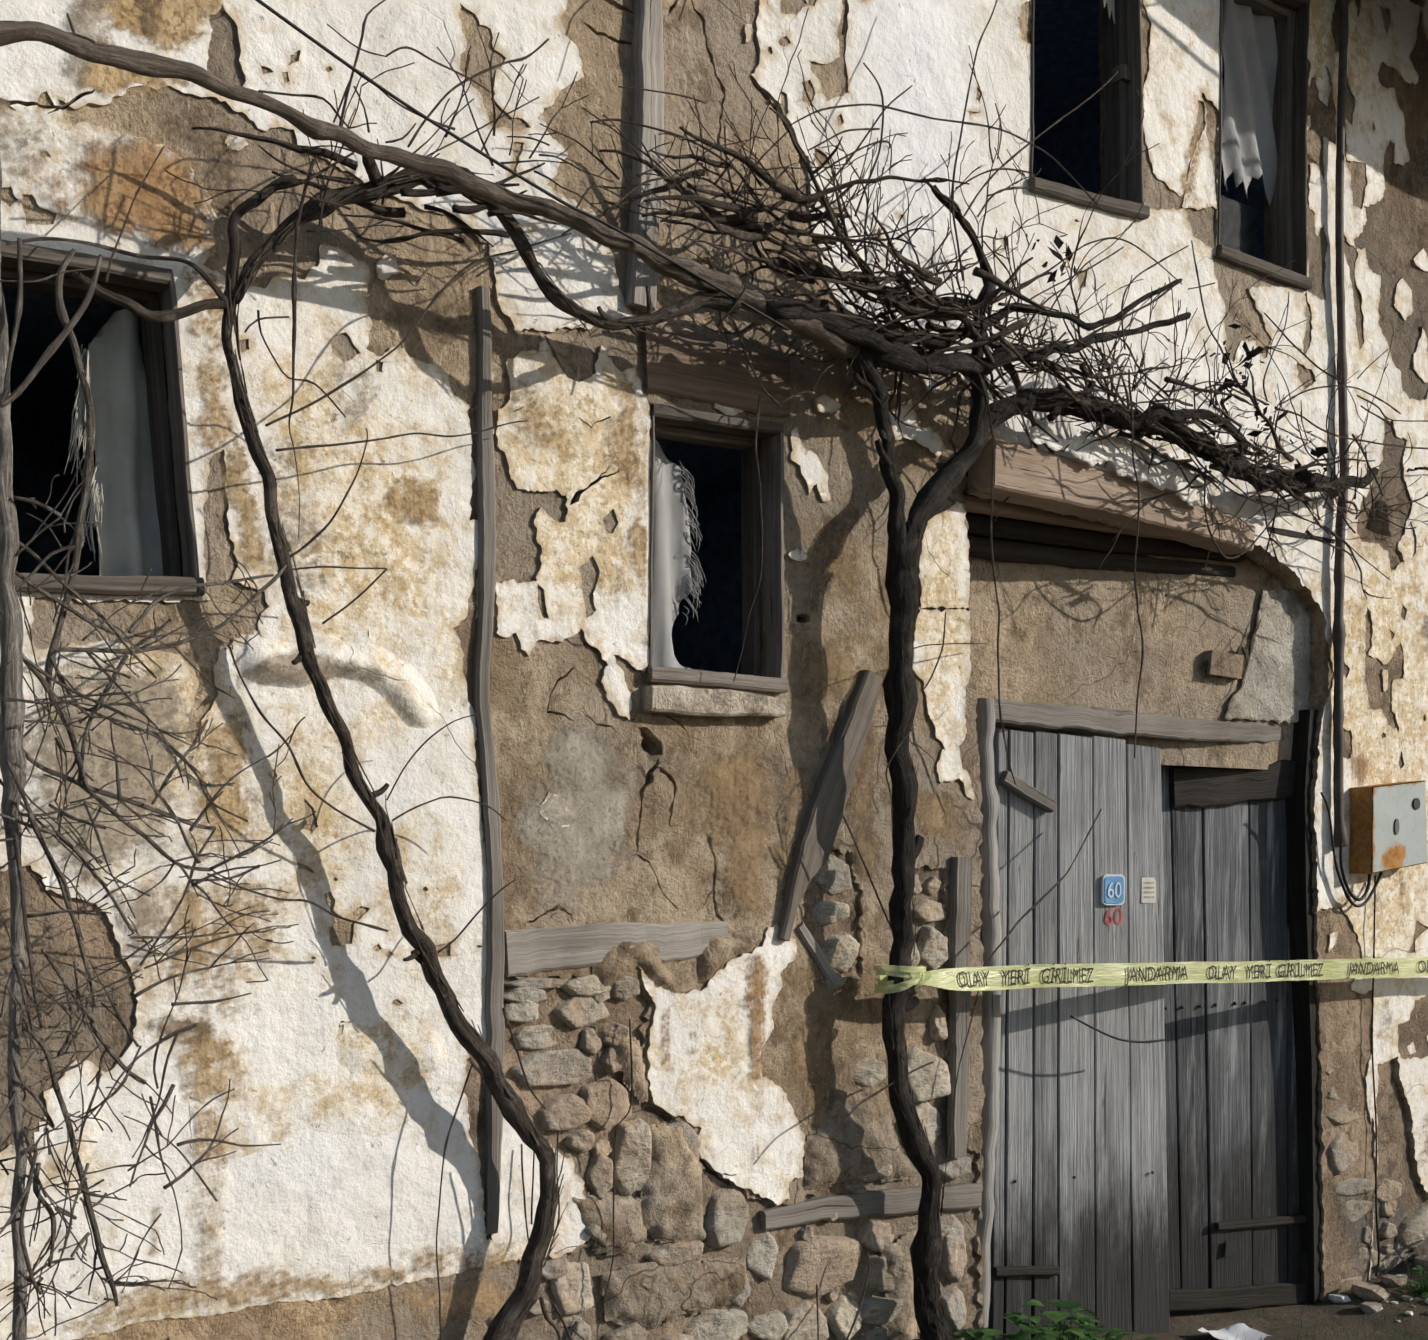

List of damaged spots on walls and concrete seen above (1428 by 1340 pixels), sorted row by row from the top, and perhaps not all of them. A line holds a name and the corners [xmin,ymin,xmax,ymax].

peeling [541,0,634,233]
peeling [658,0,847,311]
peeling [1143,94,1288,361]
peeling [1297,12,1428,401]
damp [241,649,387,685]
peeling [27,86,972,1340]
crack [639,765,674,810]
peeling [0,865,137,1151]
damp [23,661,515,1337]
flaking render [904,662,986,1340]
peeling [1317,978,1428,1302]
damp [1334,1179,1428,1266]